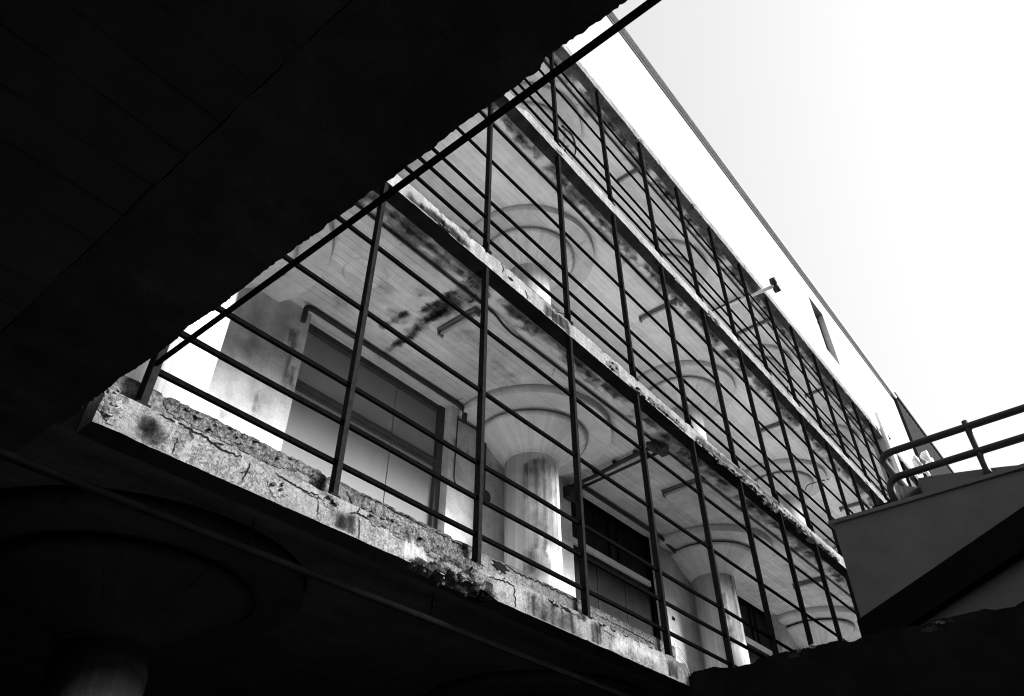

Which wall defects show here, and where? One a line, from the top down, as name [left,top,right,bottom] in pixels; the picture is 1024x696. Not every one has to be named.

spalling [0,0,627,425]
leakage [363,190,489,346]
leakage [141,419,158,437]
crack [160,414,252,479]
spalling [164,397,339,508]
spalling [361,498,510,601]
peeling [629,383,687,432]
spalling [713,452,840,561]